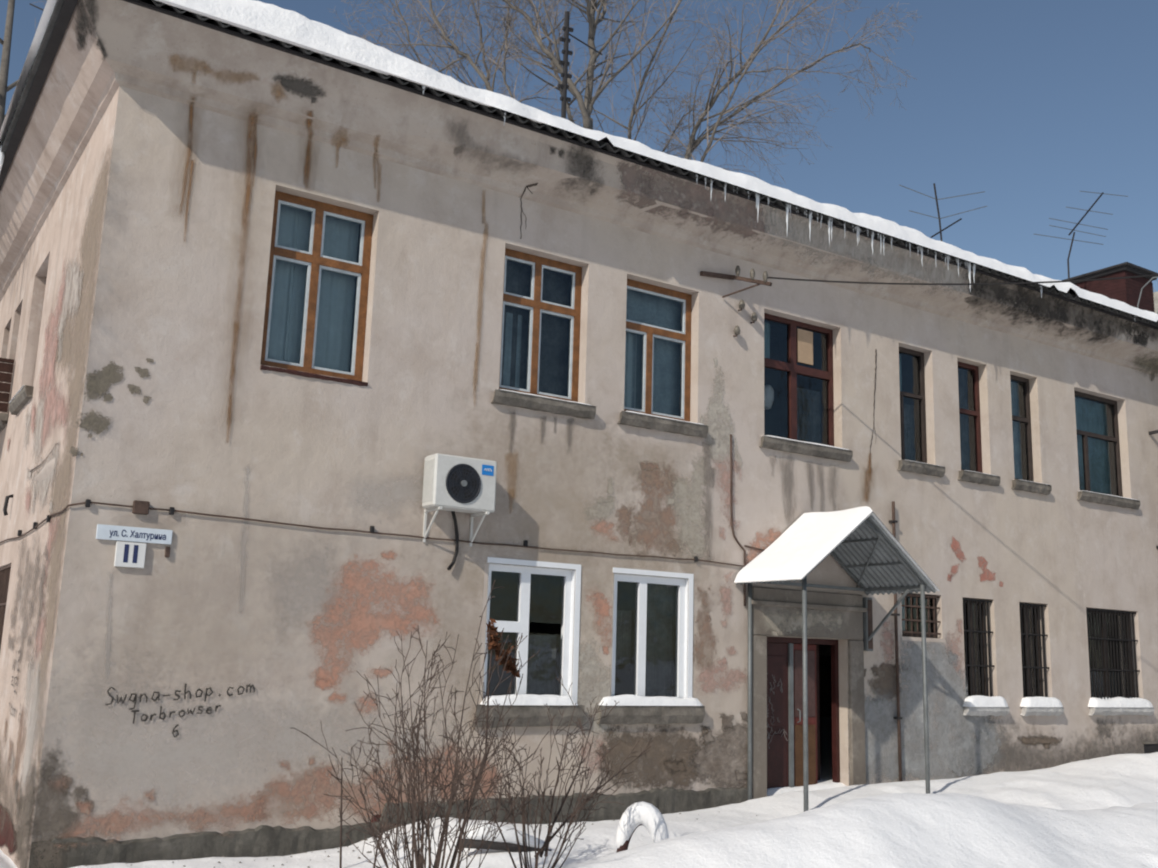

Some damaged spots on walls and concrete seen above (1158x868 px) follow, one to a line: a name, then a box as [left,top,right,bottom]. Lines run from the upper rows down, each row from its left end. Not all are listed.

corrosion [181,97,195,231]
corrosion [243,115,257,224]
corrosion [304,111,313,185]
water stain [551,146,600,193]
corrosion [477,192,487,337]
water stain [0,162,110,830]
peeling [591,461,681,556]
peeling [948,537,1003,587]
peeling [313,552,438,712]
peeling [0,601,500,868]